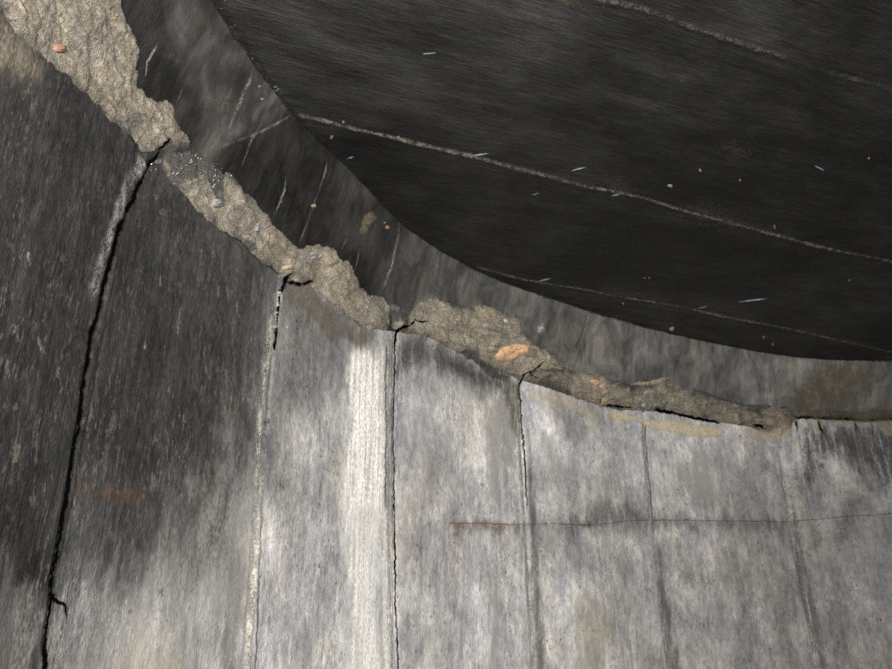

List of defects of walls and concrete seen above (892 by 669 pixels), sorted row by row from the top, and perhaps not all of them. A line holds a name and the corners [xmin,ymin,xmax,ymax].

crack [41,136,172,669]
crack [384,318,427,669]
crack [456,360,892,526]